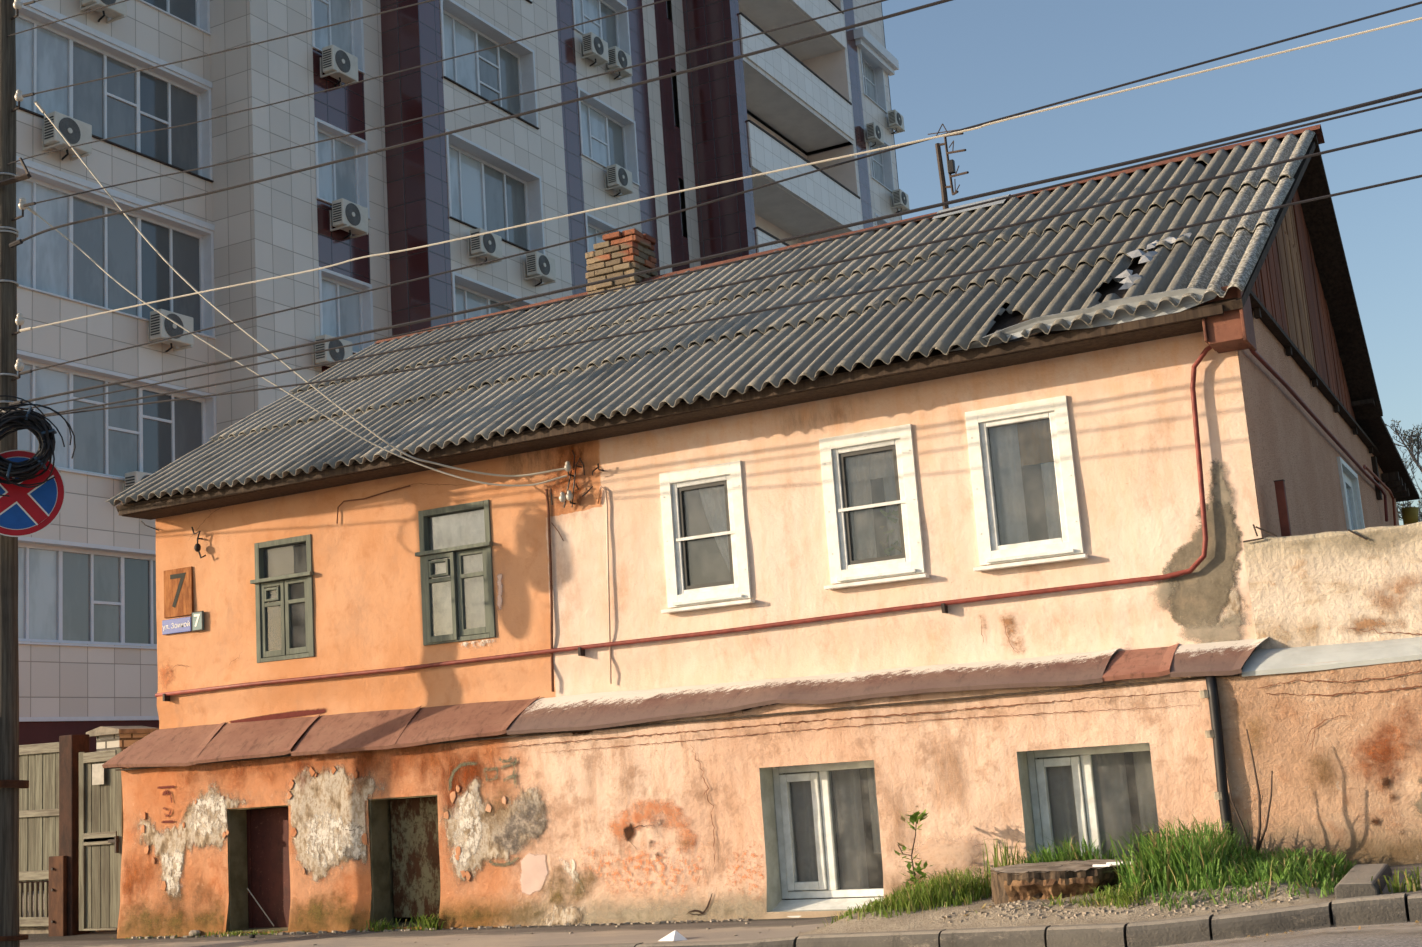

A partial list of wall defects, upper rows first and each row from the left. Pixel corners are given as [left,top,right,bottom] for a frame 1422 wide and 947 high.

crack [1350,627,1422,635]
crack [1260,670,1422,755]
corrosion [1358,727,1406,774]
flaking render [138,783,246,898]
flaking render [286,766,384,882]
flaking render [443,775,546,881]